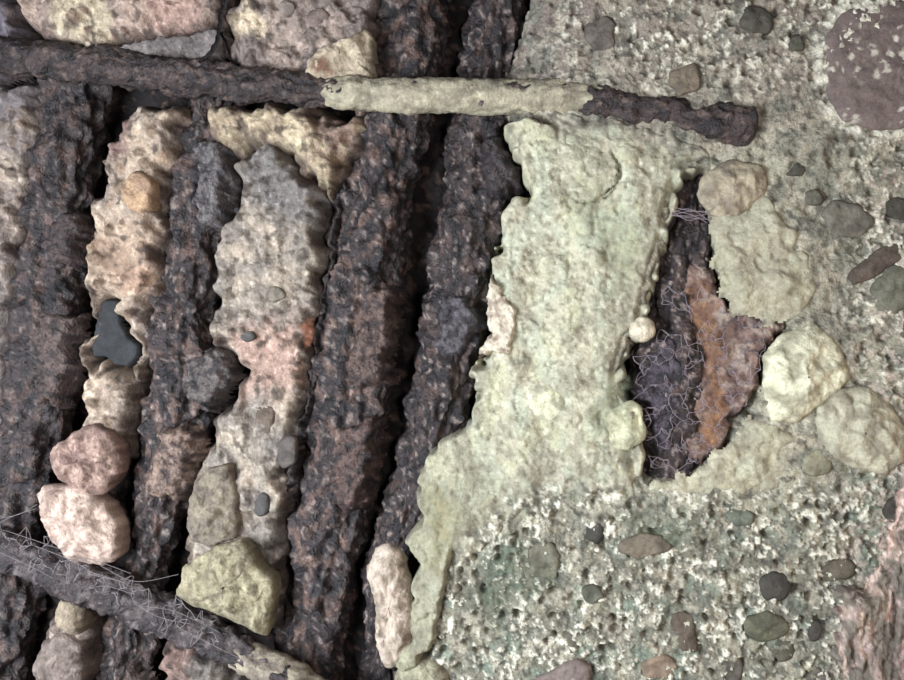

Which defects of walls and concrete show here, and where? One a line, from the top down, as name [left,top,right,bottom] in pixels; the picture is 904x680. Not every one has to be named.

spalling [0,0,454,78]
spalling [353,0,904,680]